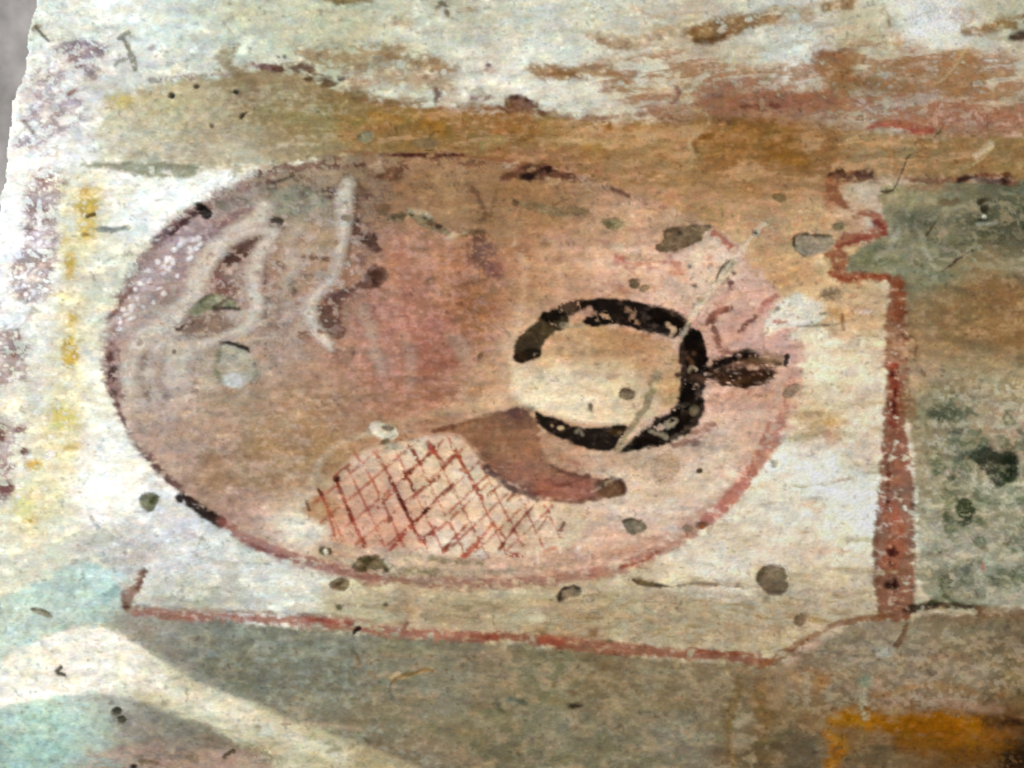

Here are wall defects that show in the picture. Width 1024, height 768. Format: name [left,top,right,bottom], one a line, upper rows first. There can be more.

peeling [909,0,967,38]
spalling [654,223,716,289]
spalling [790,220,850,260]
spalling [210,339,260,390]
peeling [697,563,881,630]